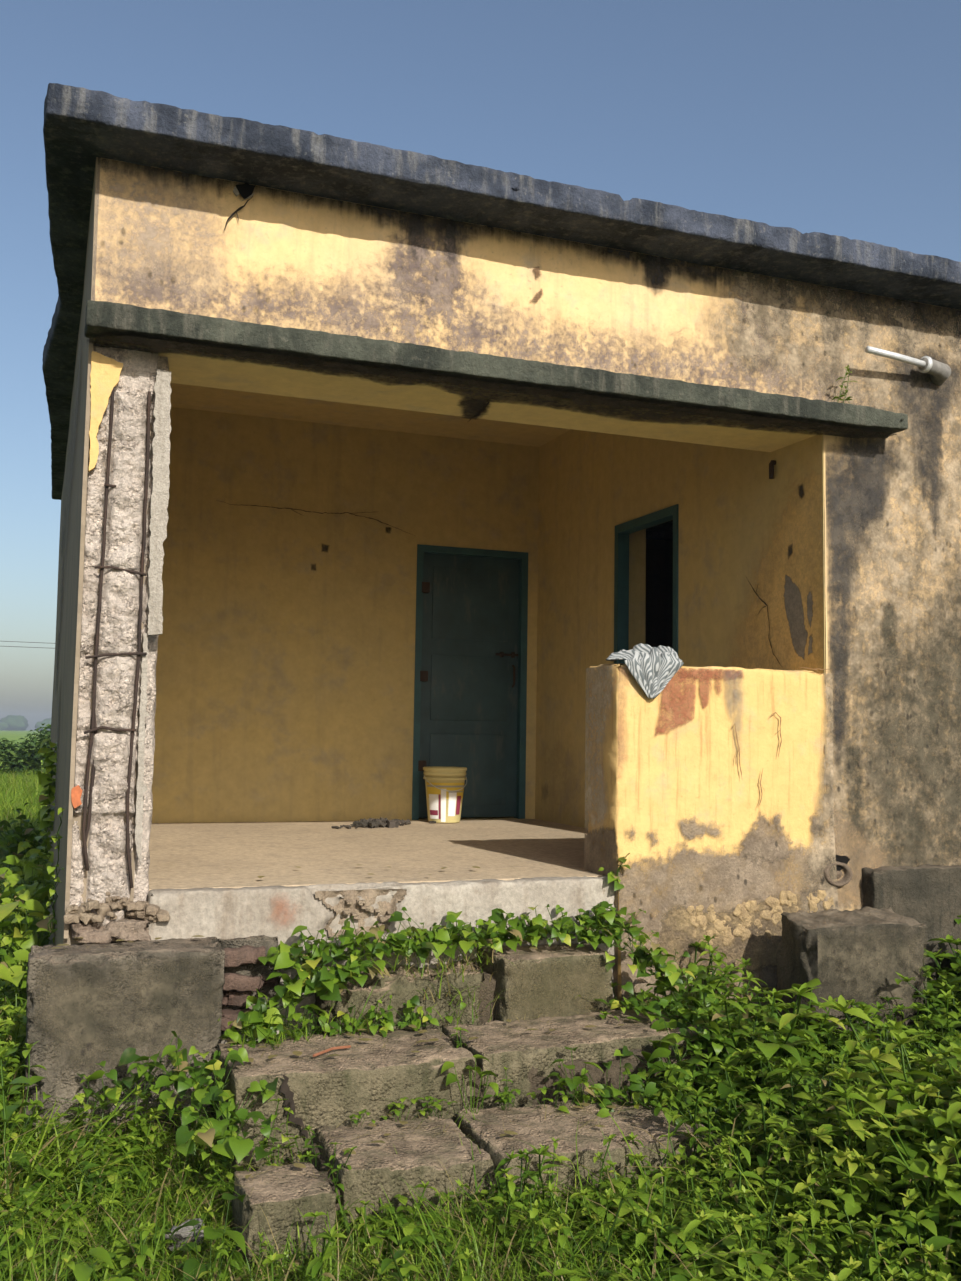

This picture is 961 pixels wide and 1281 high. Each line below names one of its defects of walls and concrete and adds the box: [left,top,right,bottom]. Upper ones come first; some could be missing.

crack [224,196,253,230]
damp [92,157,961,537]
crack [220,501,410,534]
spalling [63,346,172,944]
damp [88,335,961,916]
crack [746,577,830,671]
peeling [784,575,813,659]
spalling [315,889,407,938]
flaking render [618,810,835,1028]